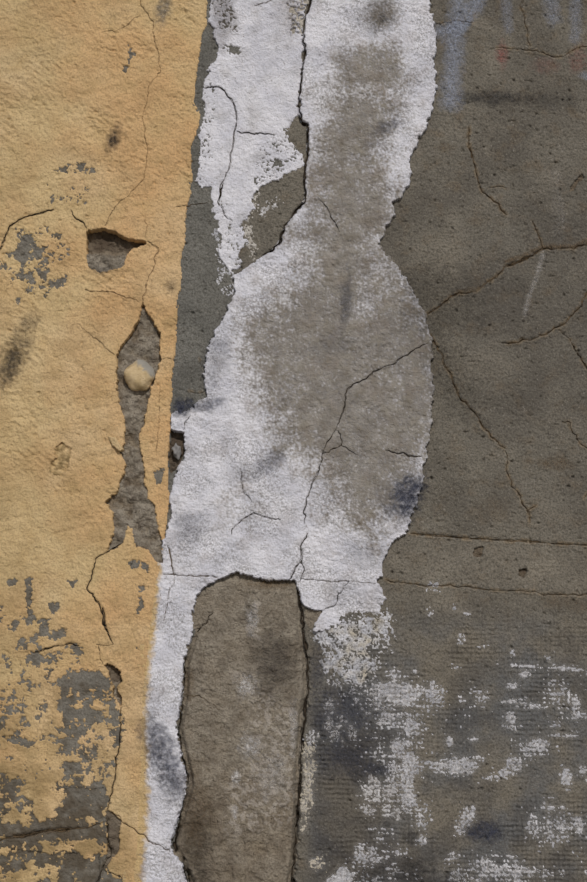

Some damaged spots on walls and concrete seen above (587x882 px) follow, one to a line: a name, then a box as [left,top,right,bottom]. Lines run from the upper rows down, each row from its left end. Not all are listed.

peeling [211,0,238,33]
peeling [222,44,241,55]
peeling [0,226,70,305]
crack [0,0,161,249]
spalling [87,231,146,273]
crack [182,86,275,219]
peeling [211,128,302,296]
spalling [106,307,185,573]
crack [36,544,121,661]
crack [290,221,587,882]
crack [177,658,220,782]
crack [0,705,190,882]